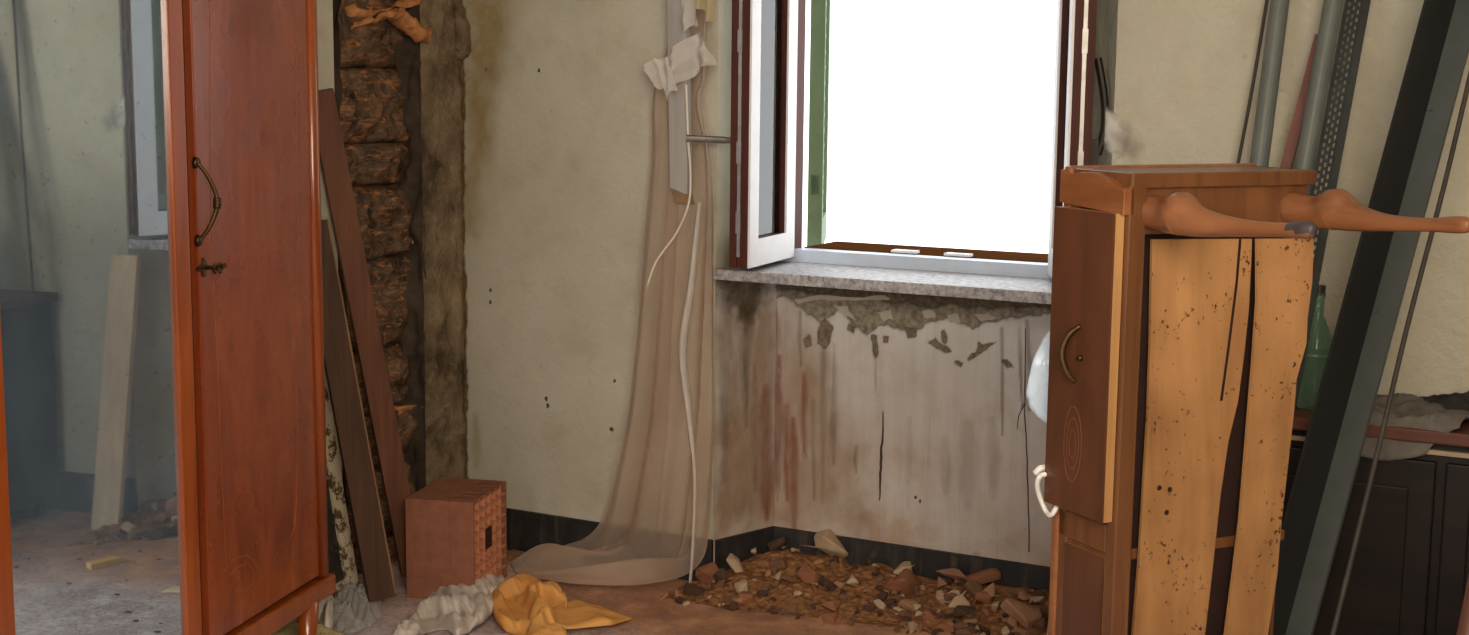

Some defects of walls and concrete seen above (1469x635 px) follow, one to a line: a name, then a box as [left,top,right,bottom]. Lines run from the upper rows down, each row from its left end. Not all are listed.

spalling [333,0,472,495]
damp [717,280,767,410]
peeling [776,284,1051,367]
spalling [338,256,397,574]
crack [877,411,885,501]